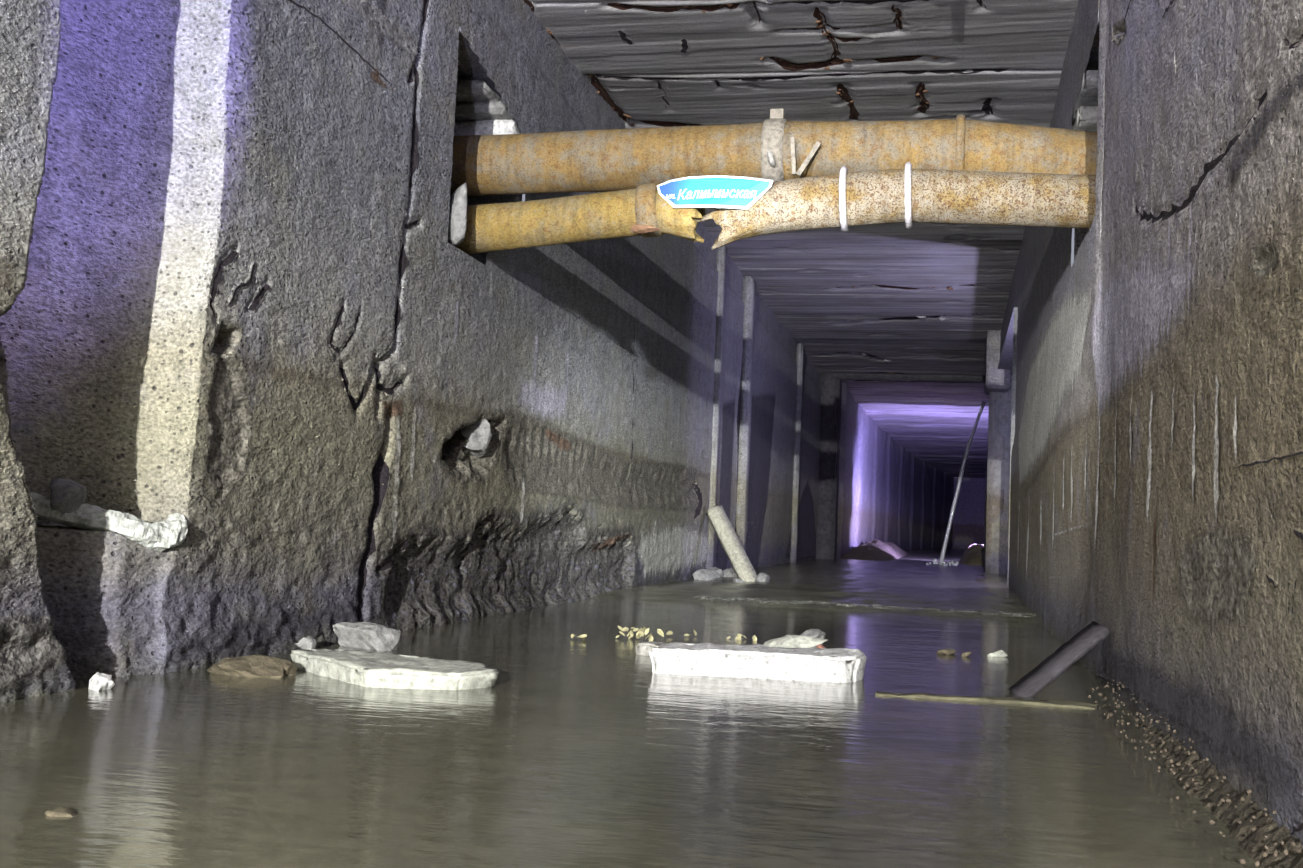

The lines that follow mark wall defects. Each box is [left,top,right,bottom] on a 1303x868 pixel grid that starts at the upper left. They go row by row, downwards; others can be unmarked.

crack [1162,0,1176,20]
crack [586,0,1041,127]
crack [1135,90,1267,227]
corrosion [631,225,661,233]
spalling [209,321,242,359]
crack [284,0,431,621]
crack [836,284,977,374]
crack [456,511,499,568]
spalling [377,409,700,632]
crack [692,483,702,520]
crack [734,359,742,532]
crack [1234,449,1303,470]